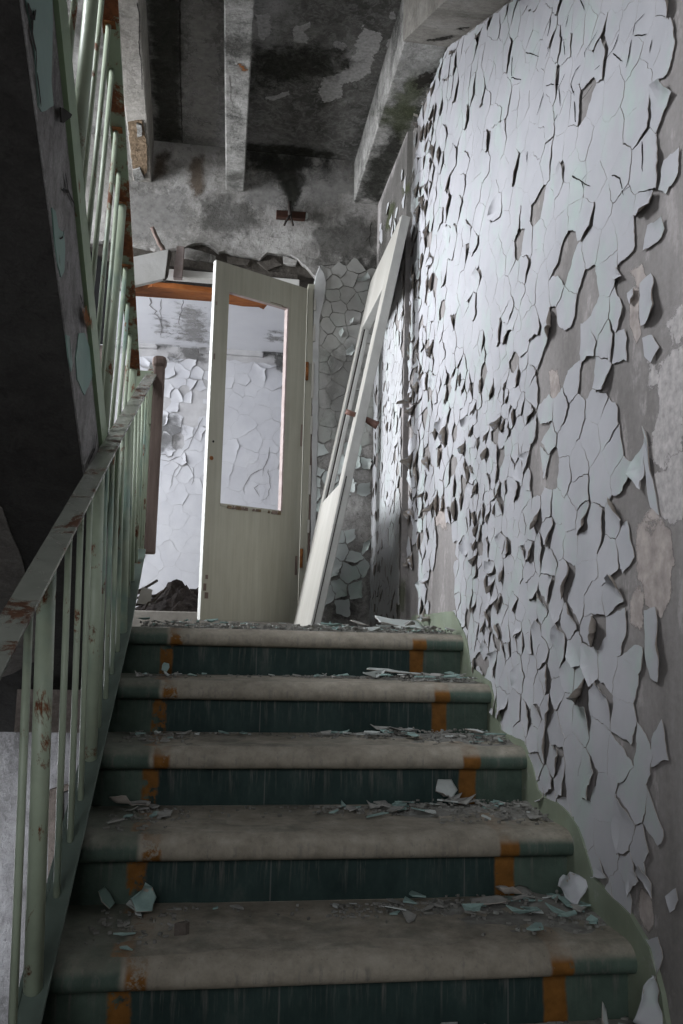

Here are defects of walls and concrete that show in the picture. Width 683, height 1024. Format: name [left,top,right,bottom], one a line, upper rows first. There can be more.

damp [153,153,170,179]
damp [247,159,354,211]
damp [130,191,188,239]
peeling [119,353,154,371]
peeling [214,354,283,510]
peeling [135,356,208,608]
peeling [316,0,680,1024]